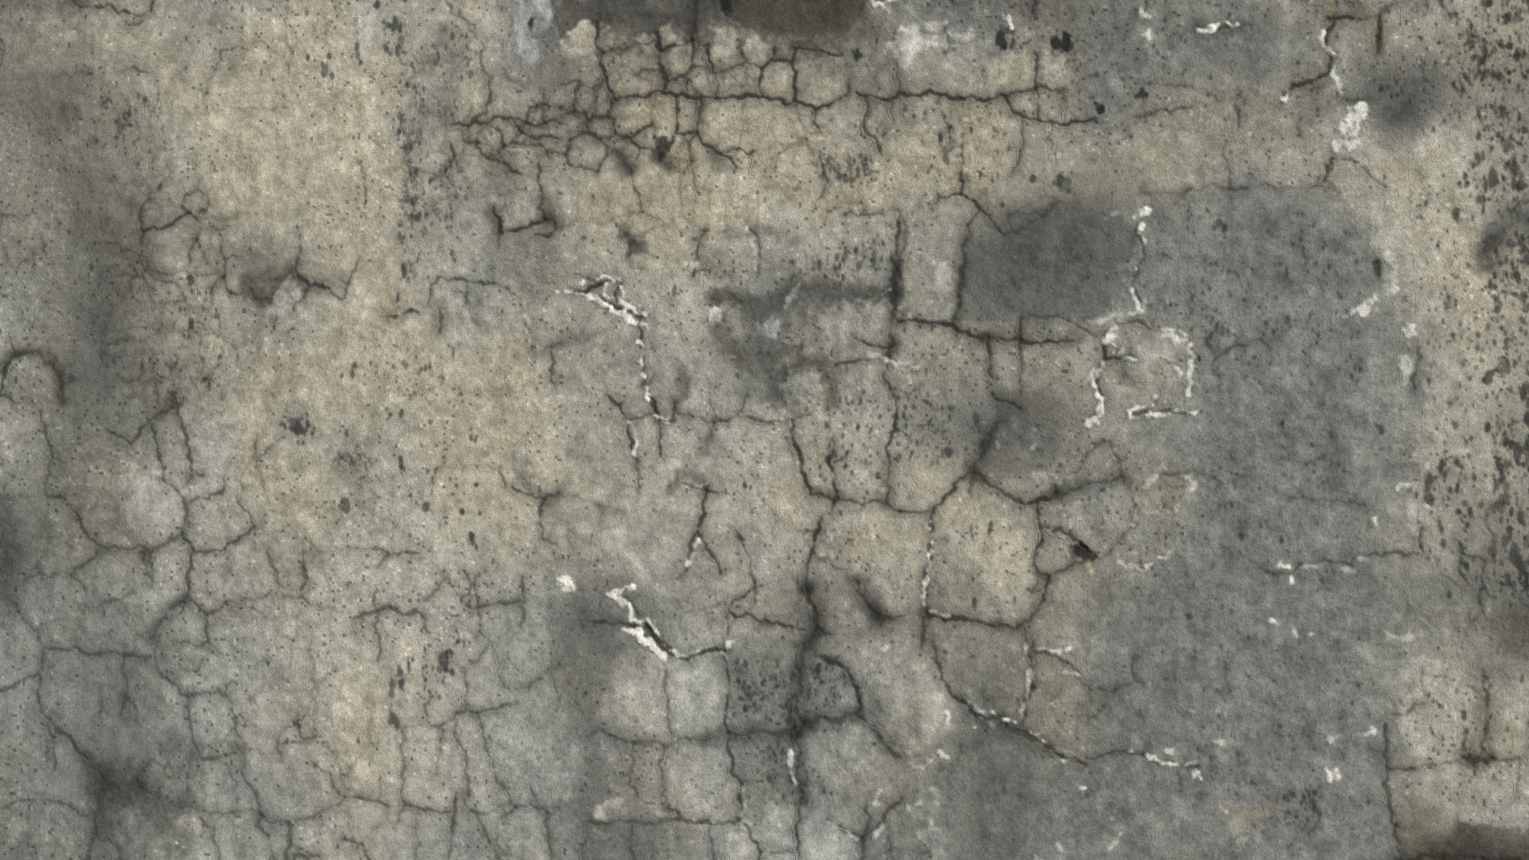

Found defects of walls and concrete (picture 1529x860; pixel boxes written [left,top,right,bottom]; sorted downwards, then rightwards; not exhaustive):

crack [201,5,334,112]
crack [0,211,49,271]
crack [0,331,76,406]
crack [85,159,369,362]
crack [383,266,567,395]
crack [443,0,1388,860]
leakage [476,0,1529,860]
crack [0,363,562,860]